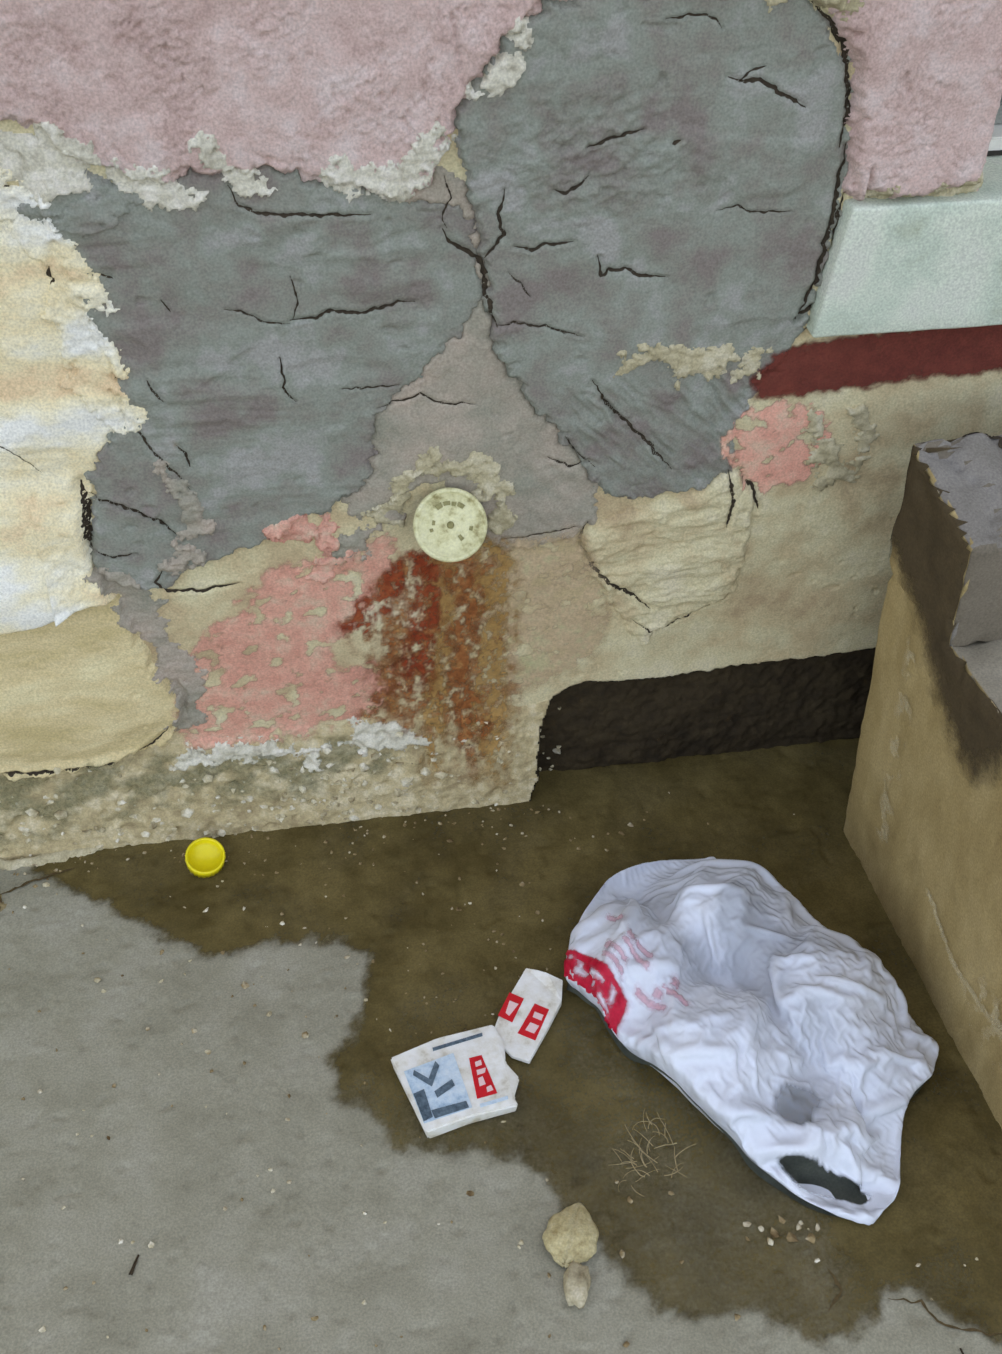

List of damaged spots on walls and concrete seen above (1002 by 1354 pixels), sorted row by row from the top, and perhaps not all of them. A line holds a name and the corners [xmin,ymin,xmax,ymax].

flaking render [464,16,534,101]
crack [728,66,806,108]
crack [228,186,371,218]
crack [442,176,665,336]
crack [224,277,415,325]
spalling [0,121,457,782]
crack [80,480,176,559]
crack [726,469,759,528]
crack [154,571,237,593]
leakage [890,439,1002,780]
corrosion [339,537,518,779]
leakage [31,738,1002,1344]